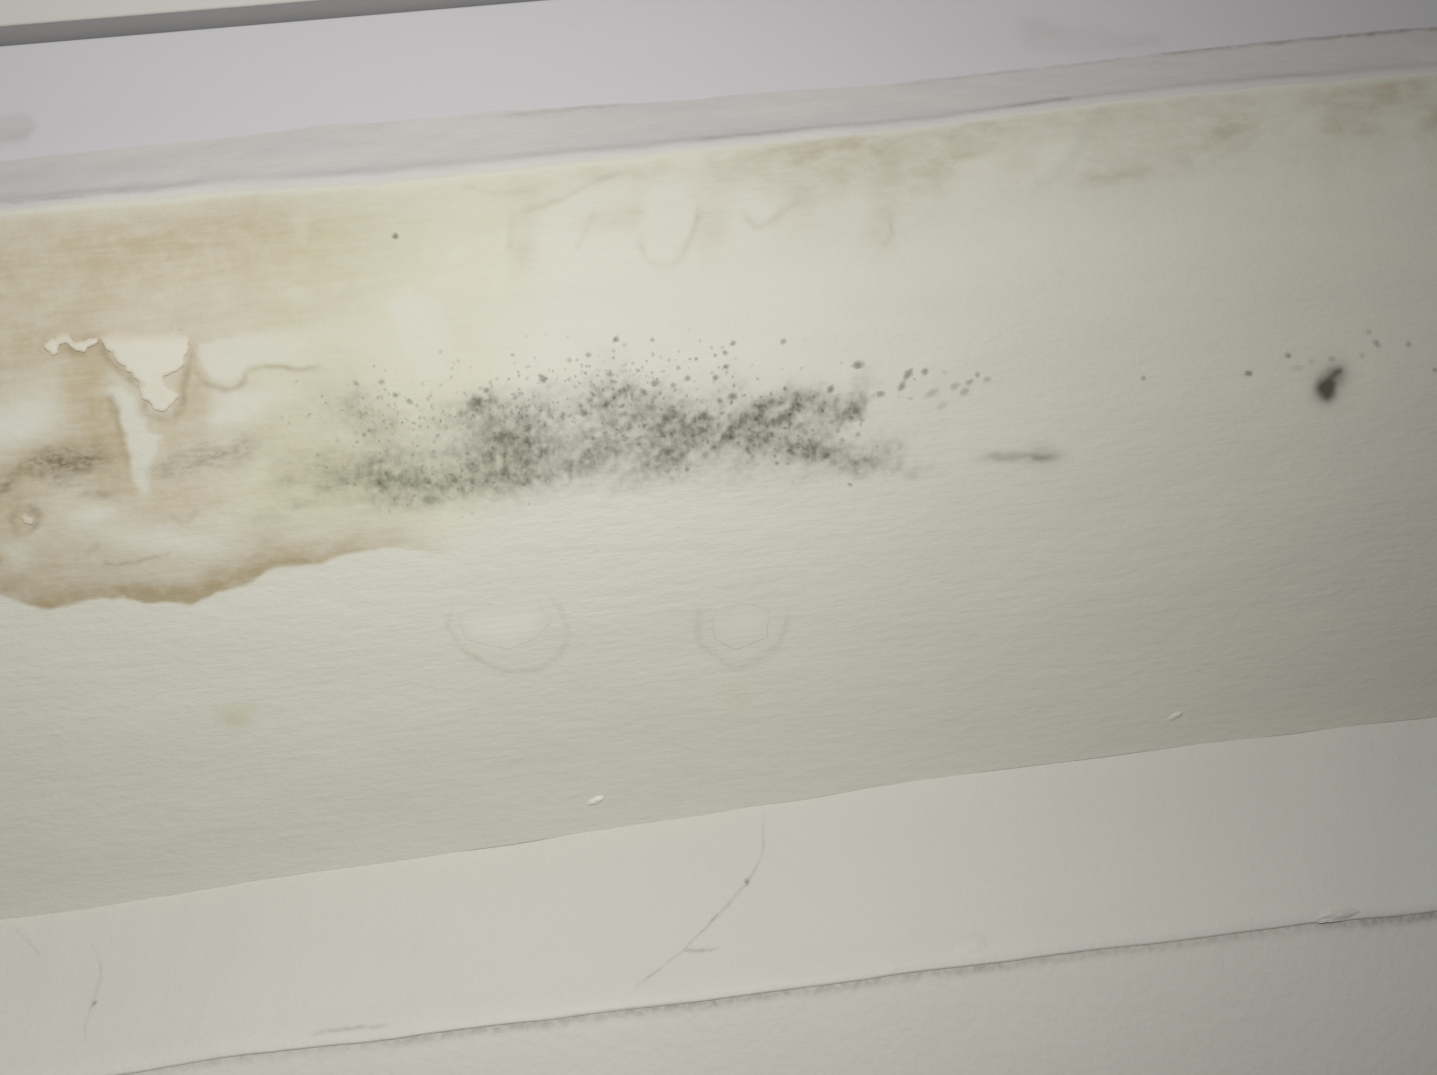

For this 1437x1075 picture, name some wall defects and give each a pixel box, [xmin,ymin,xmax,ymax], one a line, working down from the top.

peeling [43,327,189,411]
leakage [1319,378,1334,398]